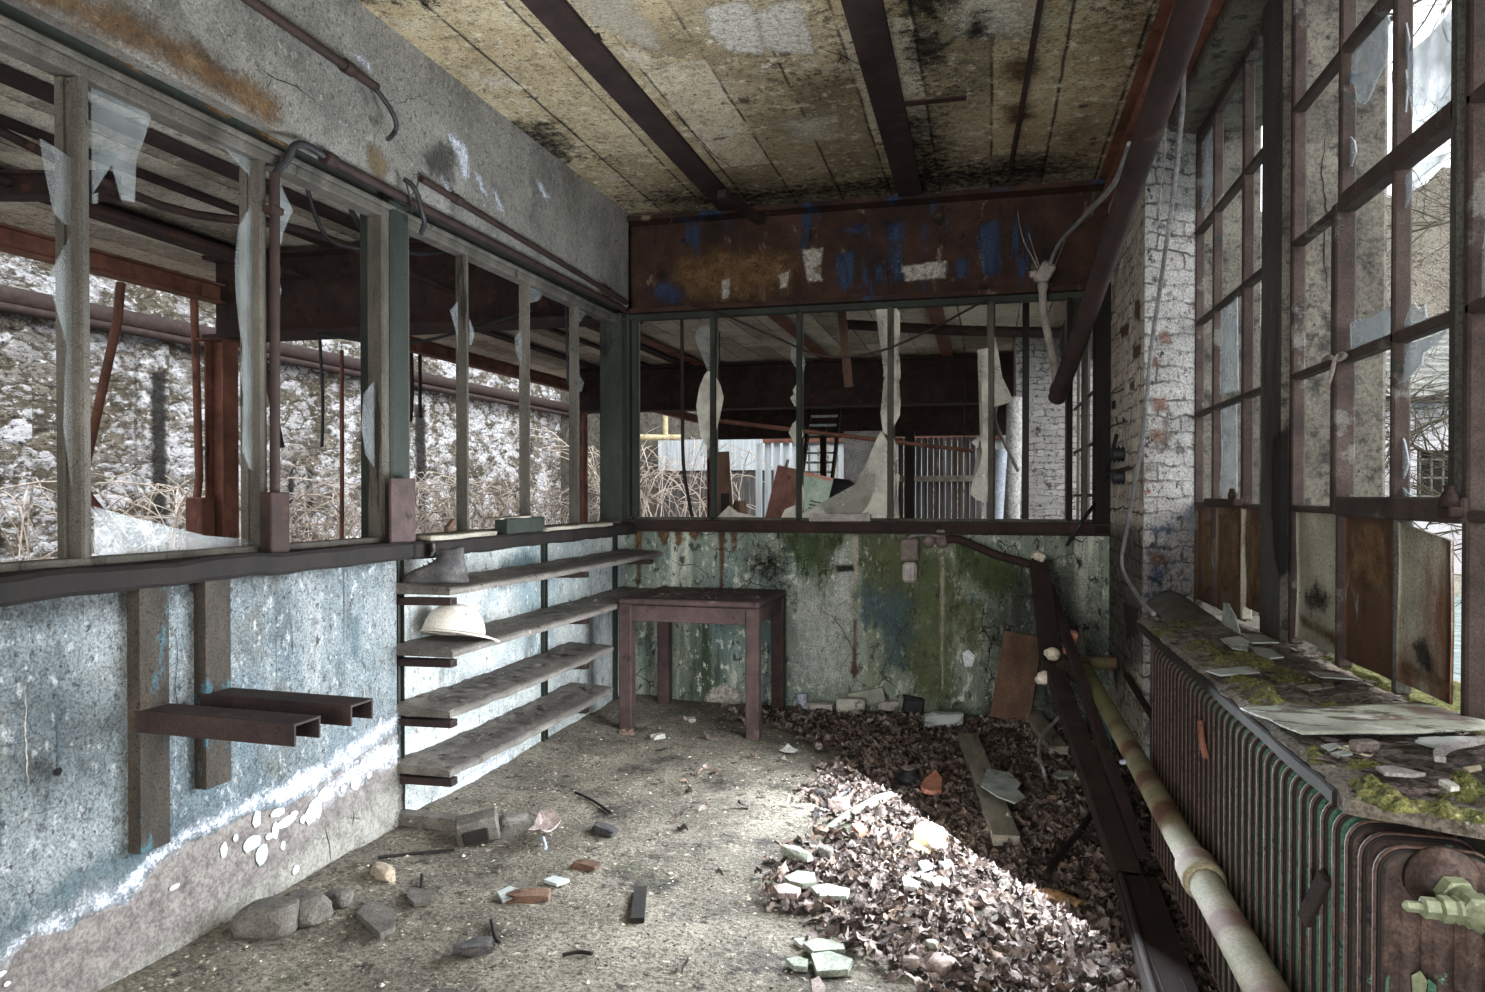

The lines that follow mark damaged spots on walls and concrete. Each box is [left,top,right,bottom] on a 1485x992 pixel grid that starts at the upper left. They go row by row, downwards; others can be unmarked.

corrosion [27,0,286,147]
leakage [891,0,1160,74]
leakage [723,148,898,206]
leakage [907,105,1099,193]
peeling [945,220,1002,280]
spalling [1111,299,1171,367]
spalling [1153,398,1168,411]
leakage [794,535,858,699]
leakage [0,712,401,992]